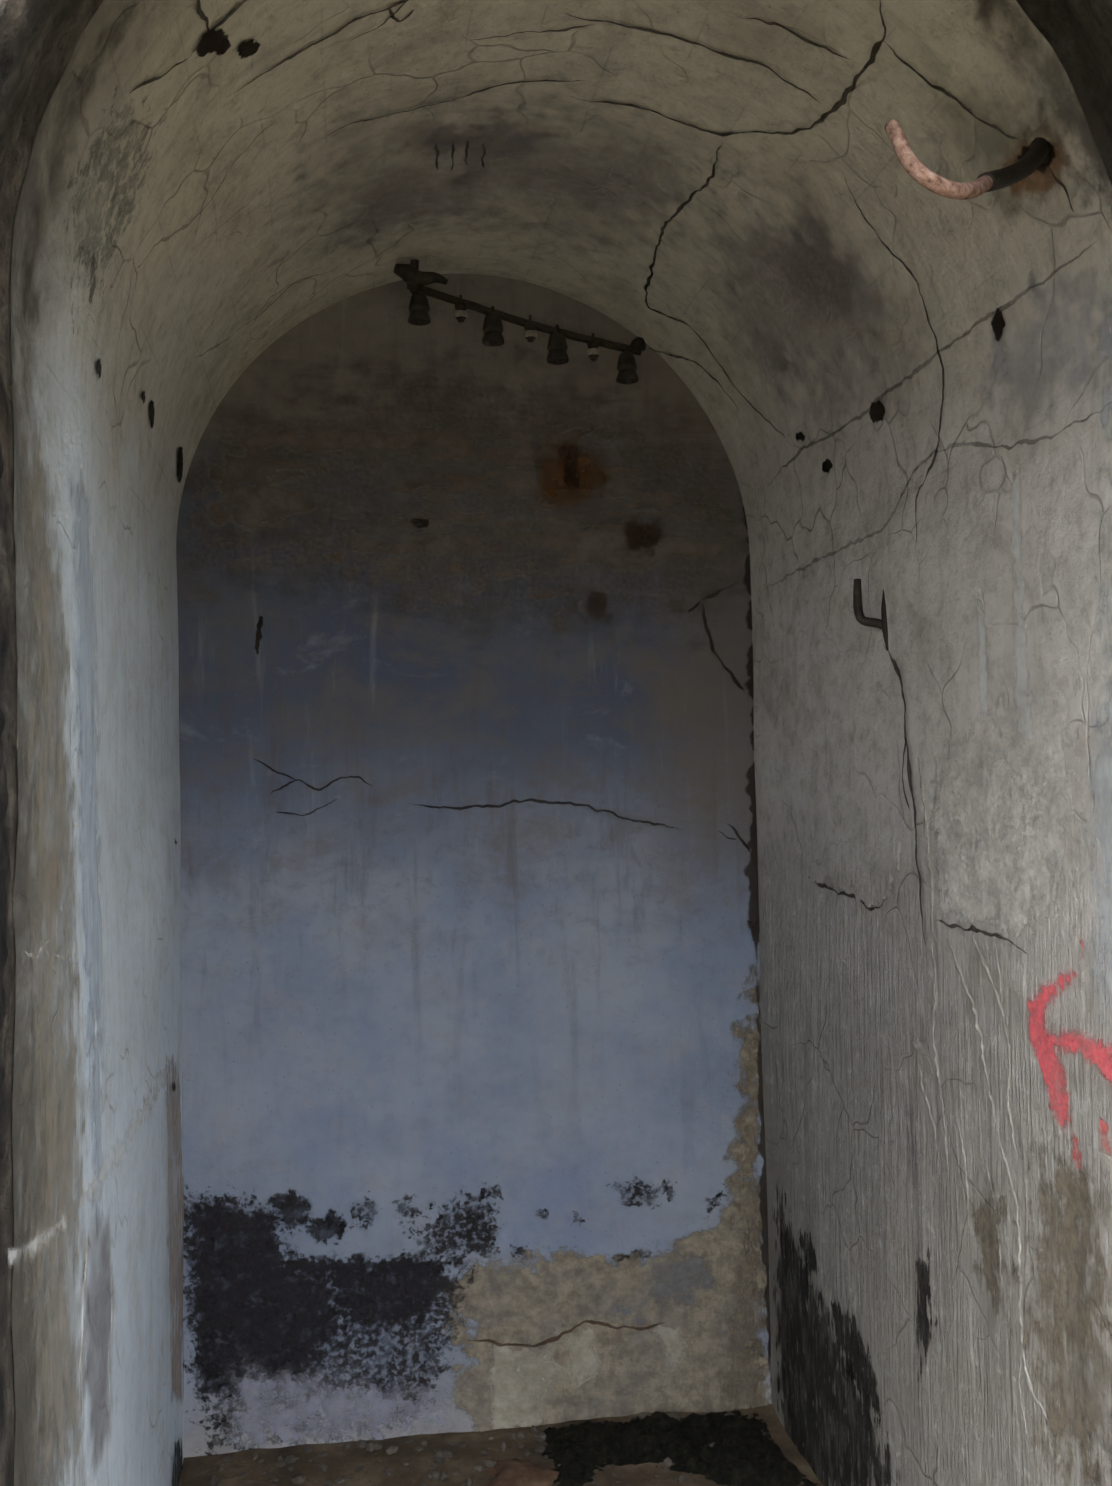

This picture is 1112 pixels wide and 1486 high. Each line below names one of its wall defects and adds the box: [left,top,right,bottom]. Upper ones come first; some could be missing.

crack [130,0,247,93]
crack [236,0,414,92]
crack [331,0,1015,437]
crack [846,182,944,542]
rust [540,442,609,506]
rust [624,521,662,556]
crack [416,798,674,828]
peeling [440,1022,770,1432]
leakage [607,1176,677,1210]
leakage [706,965,902,1486]
leakage [182,1184,524,1456]
leakage [172,1437,183,1486]